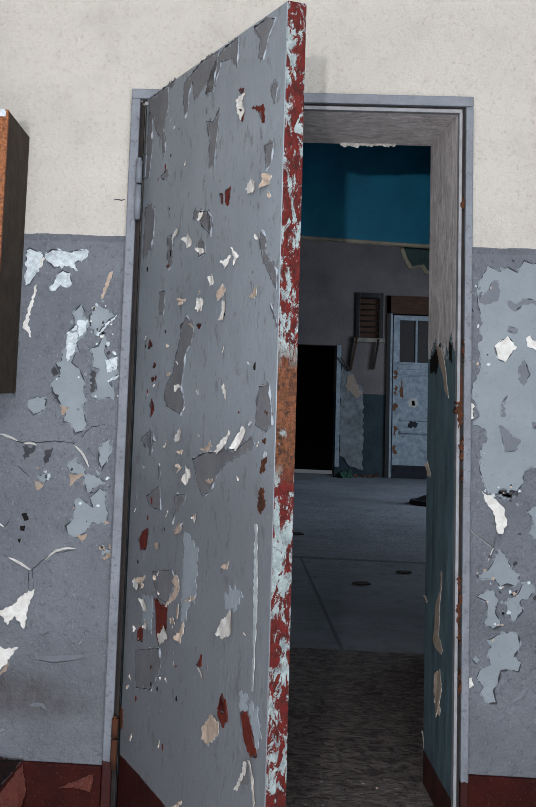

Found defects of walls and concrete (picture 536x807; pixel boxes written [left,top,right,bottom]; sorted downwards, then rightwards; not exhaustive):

peeling [254,16,277,63]
peeling [146,37,240,181]
peeling [23,247,89,337]
peeling [27,271,120,438]
peeling [145,290,204,417]
peeling [63,438,112,543]
peeling [126,381,274,701]
peeling [469,258,536,705]
peeling [0,573,34,629]
peeling [0,646,18,675]
peeling [239,691,262,750]
peeling [0,757,26,807]